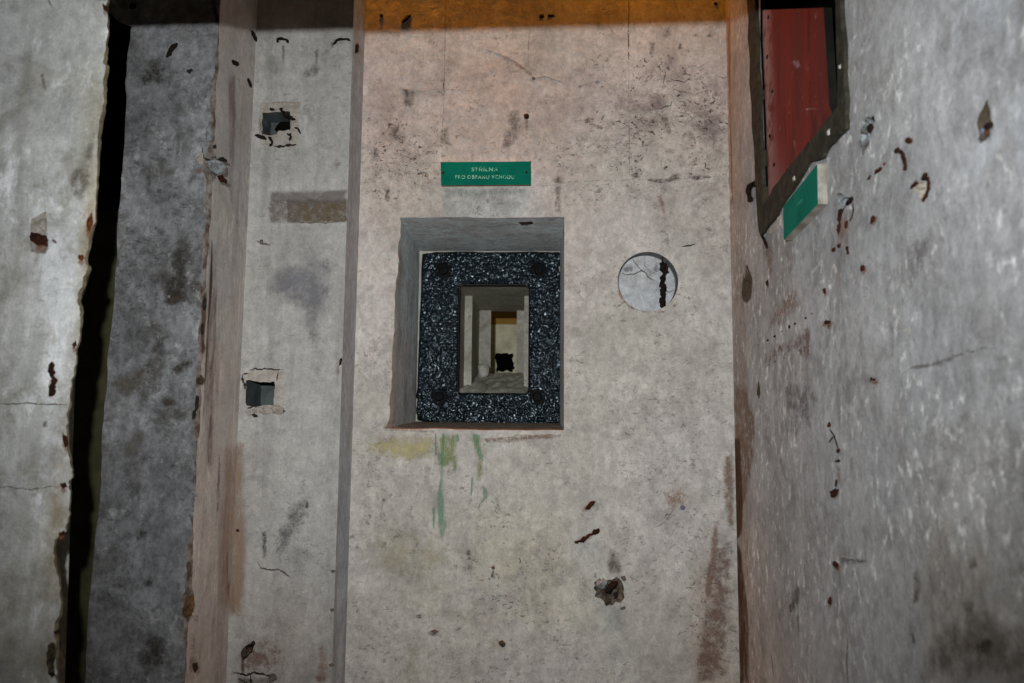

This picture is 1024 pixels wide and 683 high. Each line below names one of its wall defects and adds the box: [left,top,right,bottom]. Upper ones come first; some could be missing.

hole [255,101,301,148]
spalling [977,99,994,144]
spalling [195,124,228,184]
rust [867,137,913,180]
rust [831,192,854,254]
crack [622,260,673,293]
crack [903,347,995,373]
crack [0,399,64,407]
hole [241,367,285,417]
water stain [725,458,733,525]
spalling [594,555,626,611]
water stain [698,526,729,680]